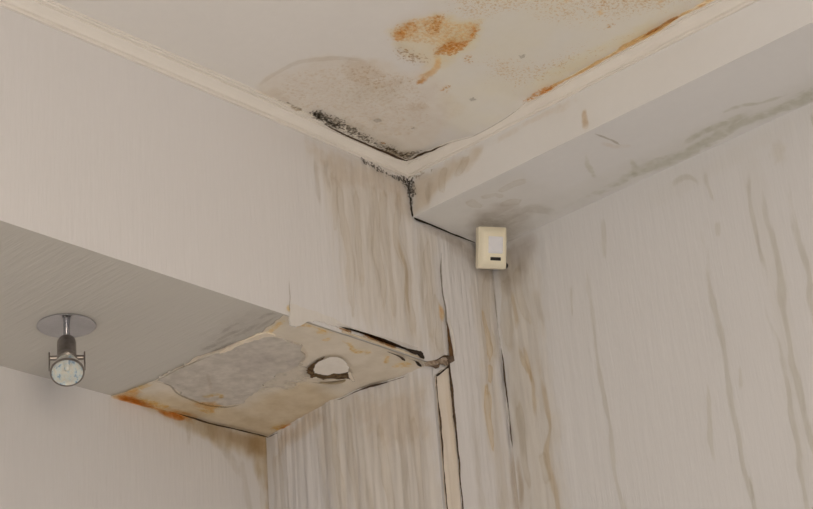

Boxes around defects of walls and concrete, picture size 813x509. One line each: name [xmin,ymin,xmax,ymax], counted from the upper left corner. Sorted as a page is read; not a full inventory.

water stain [310,110,416,159]
water stain [361,157,416,210]
peeling [112,315,462,509]
crack [335,262,464,509]